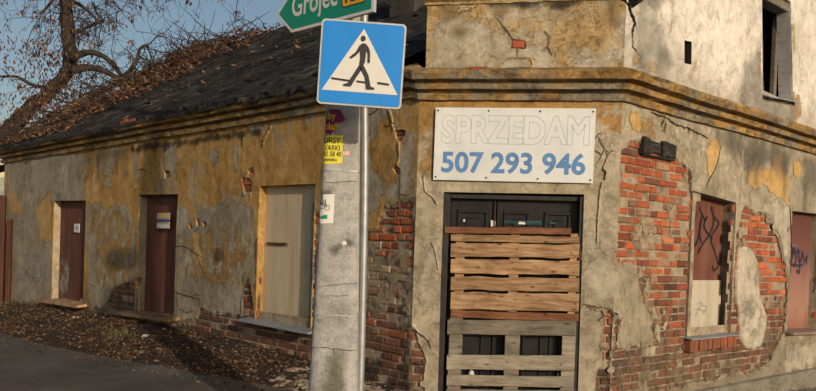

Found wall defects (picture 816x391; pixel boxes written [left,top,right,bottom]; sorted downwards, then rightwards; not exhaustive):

crack [621,0,642,64]
peeling [6,152,141,319]
peeling [163,144,178,178]
peeling [172,143,319,361]
spalling [360,101,441,391]
crack [652,111,721,188]
spalling [582,111,816,391]